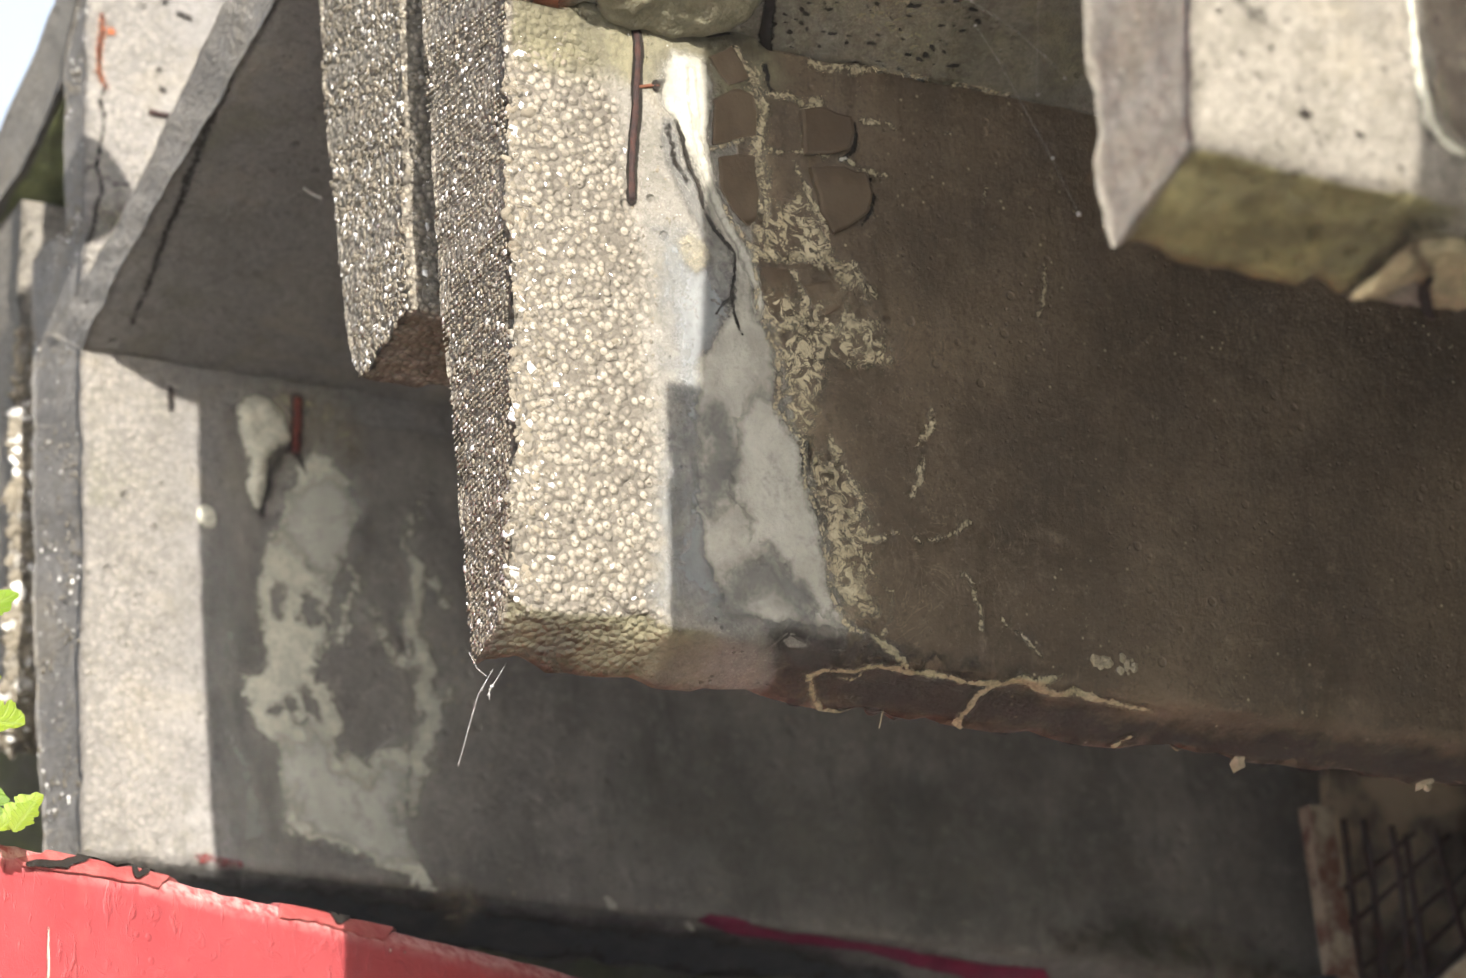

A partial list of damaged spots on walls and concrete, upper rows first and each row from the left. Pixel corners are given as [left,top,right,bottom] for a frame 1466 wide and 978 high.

crack [84,13,129,243]
spalling [1342,223,1466,320]
leakage [661,45,1466,786]
leakage [164,390,899,978]
flaking render [1437,953,1466,978]